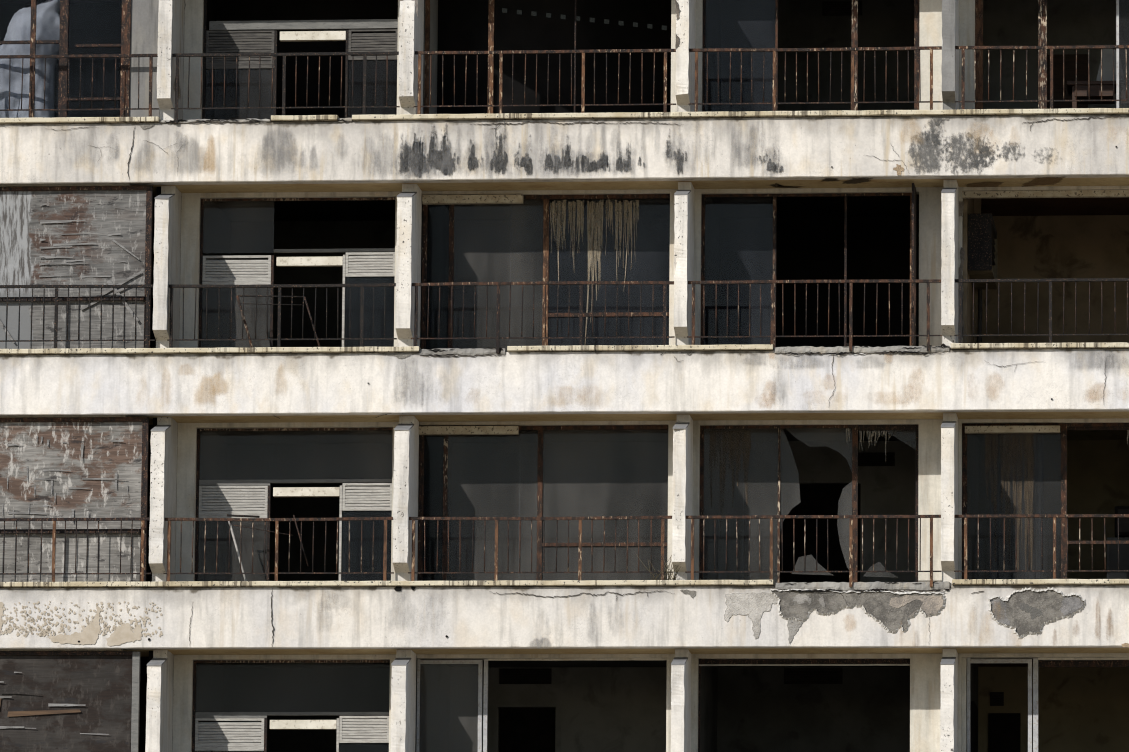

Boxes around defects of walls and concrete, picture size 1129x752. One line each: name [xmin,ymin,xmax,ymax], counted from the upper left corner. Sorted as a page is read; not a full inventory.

water stain [399,122,644,178]
water stain [666,136,687,174]
water stain [757,154,783,173]
water stain [909,116,1025,174]
peeling [0,601,163,646]
crack [268,593,276,647]
spalling [724,580,950,644]
spalling [987,587,1086,639]